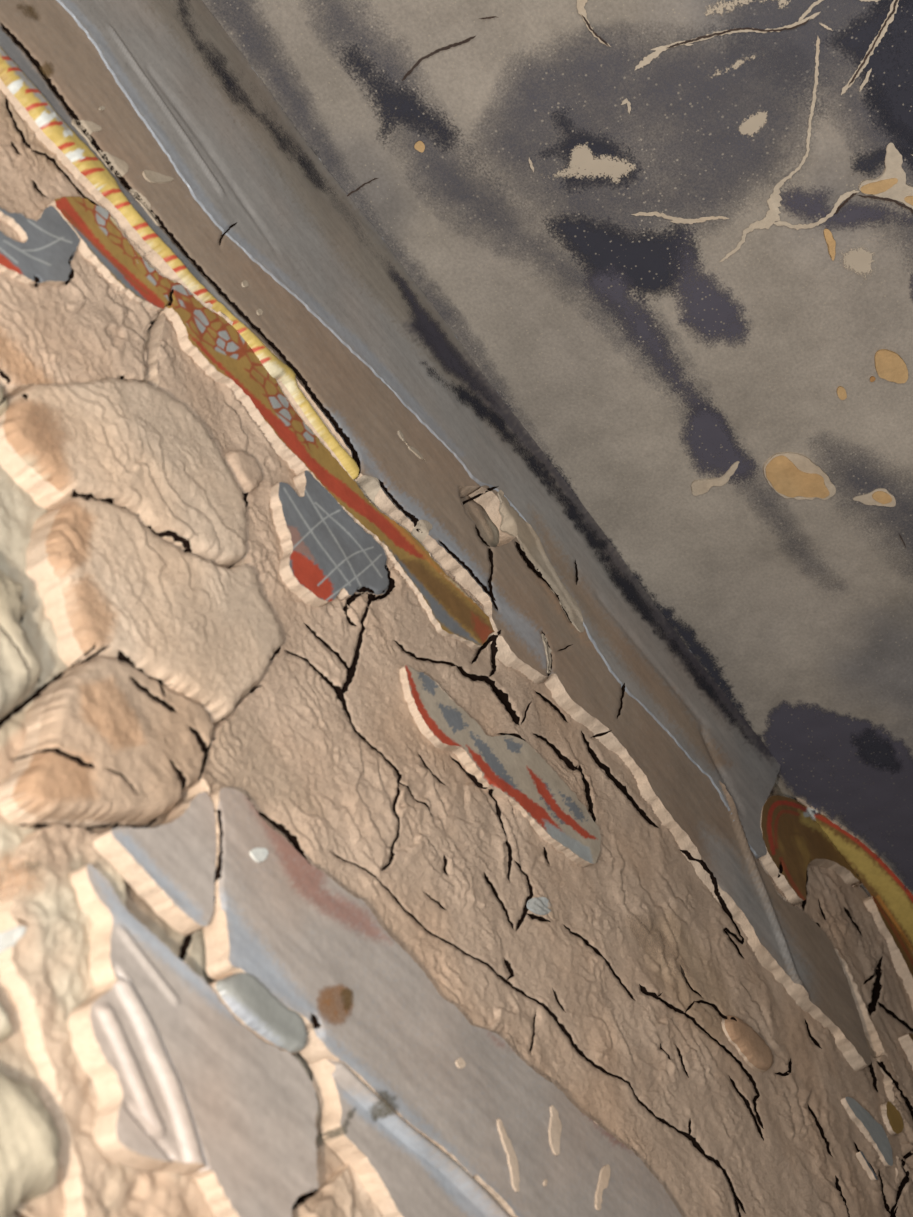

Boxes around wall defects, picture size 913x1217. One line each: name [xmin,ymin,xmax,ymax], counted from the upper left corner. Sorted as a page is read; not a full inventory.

crack [577,0,611,47]
spalling [0,79,328,491]
crack [631,0,913,262]
spalling [824,228,836,261]
spalling [859,143,913,209]
peeling [56,0,735,821]
spalling [145,313,913,1217]
spalling [0,825,403,1217]
crack [778,863,913,1032]
crack [807,1103,913,1217]
crack [869,1061,913,1117]